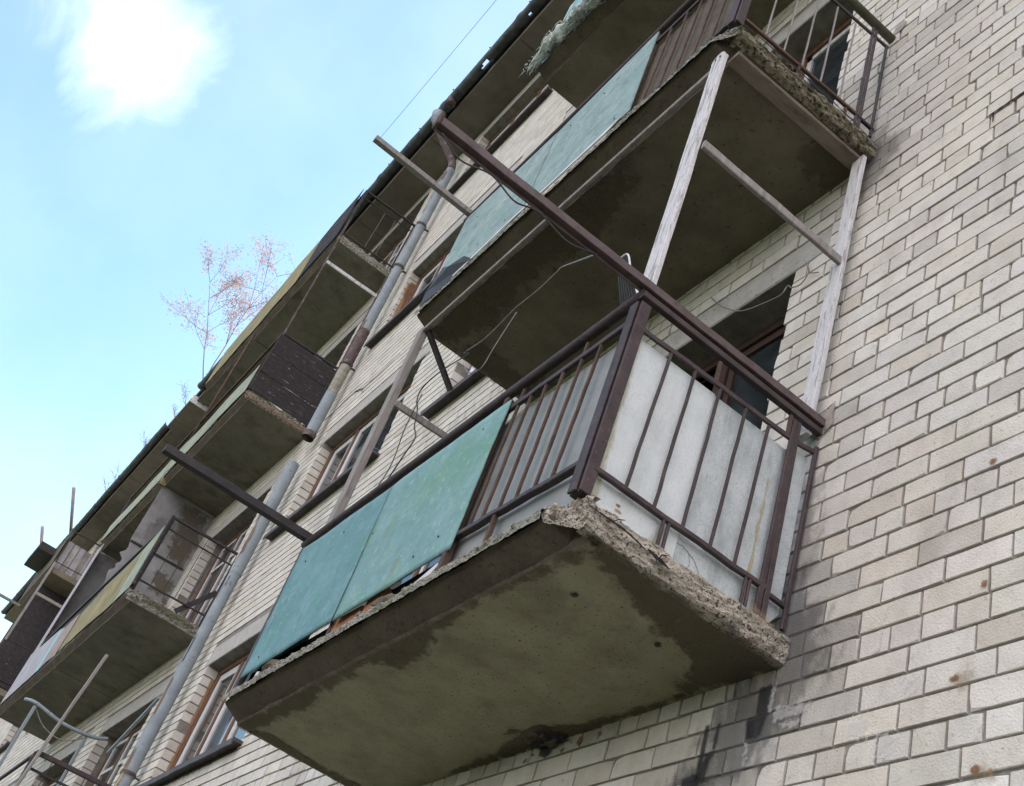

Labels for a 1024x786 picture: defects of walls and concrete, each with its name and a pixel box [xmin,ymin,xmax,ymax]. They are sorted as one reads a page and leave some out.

spalling [542,25,877,197]
spalling [220,495,790,702]
leakage [238,536,777,786]